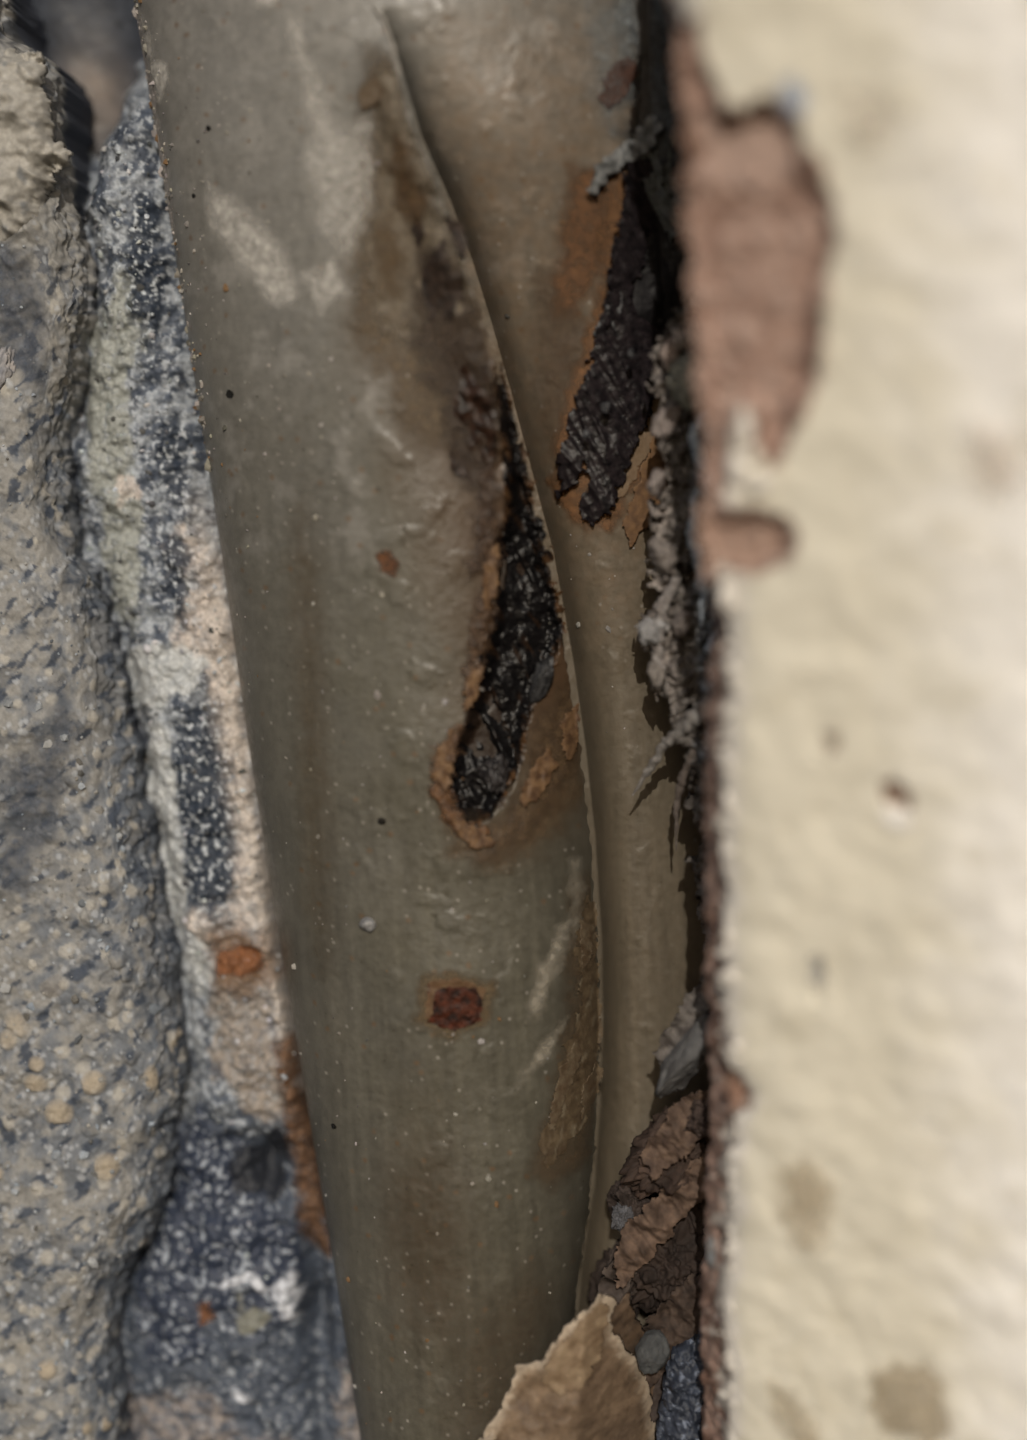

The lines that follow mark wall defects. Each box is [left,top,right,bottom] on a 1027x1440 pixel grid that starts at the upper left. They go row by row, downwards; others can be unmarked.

rust [377,551,399,576]
rust [210,932,277,991]
rust [415,971,495,1039]
spalling [724,1068,753,1113]
peeling [479,1292,656,1440]